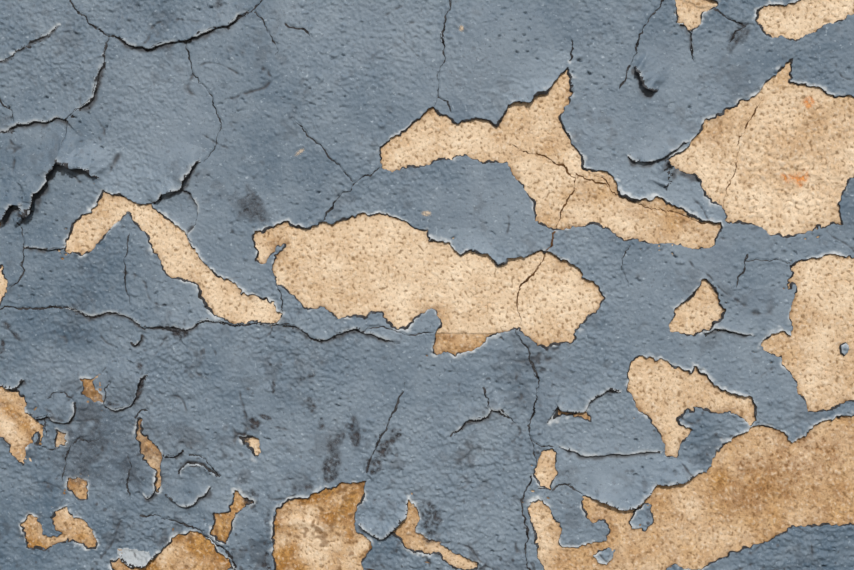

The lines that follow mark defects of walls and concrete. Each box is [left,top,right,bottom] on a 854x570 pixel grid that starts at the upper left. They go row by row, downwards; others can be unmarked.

crack [0,0,310,161]
peeling [54,143,282,324]
crack [0,216,433,344]
crack [296,122,381,220]
peeling [254,213,604,356]
crack [450,97,762,570]
peeling [380,47,854,254]
crack [619,0,664,89]
peeling [756,0,854,40]
peeling [522,254,854,570]
crack [140,514,237,570]
peeling [272,481,477,570]